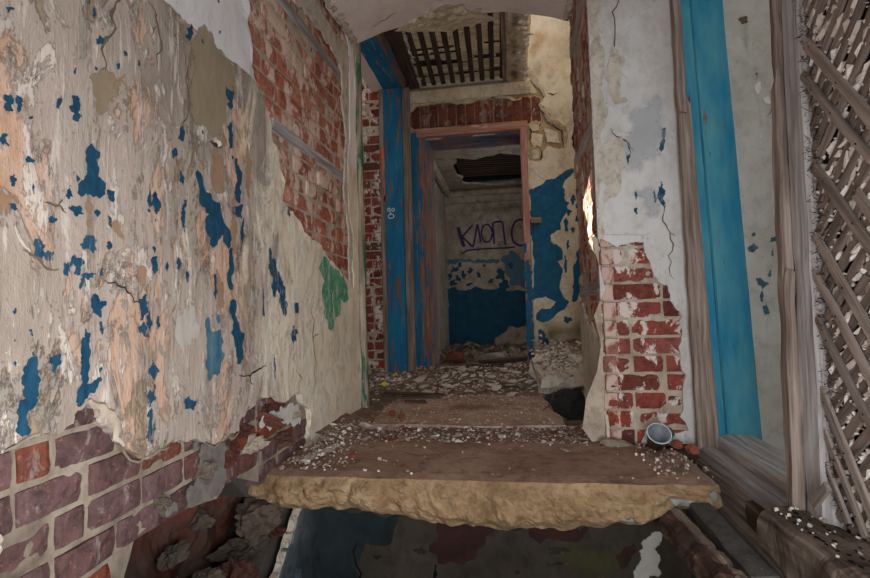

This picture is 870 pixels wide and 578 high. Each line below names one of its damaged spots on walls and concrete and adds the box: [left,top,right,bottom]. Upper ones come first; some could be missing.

crack [611,0,619,47]
peeling [4,94,33,119]
peeling [56,95,82,122]
peeling [89,24,128,115]
peeling [172,125,185,158]
peeling [174,24,252,381]
flaking render [248,0,357,331]
flaking render [362,85,384,375]
flaking render [447,0,687,447]
crack [662,203,674,279]
flaking render [0,144,307,578]
spalling [190,497,696,578]